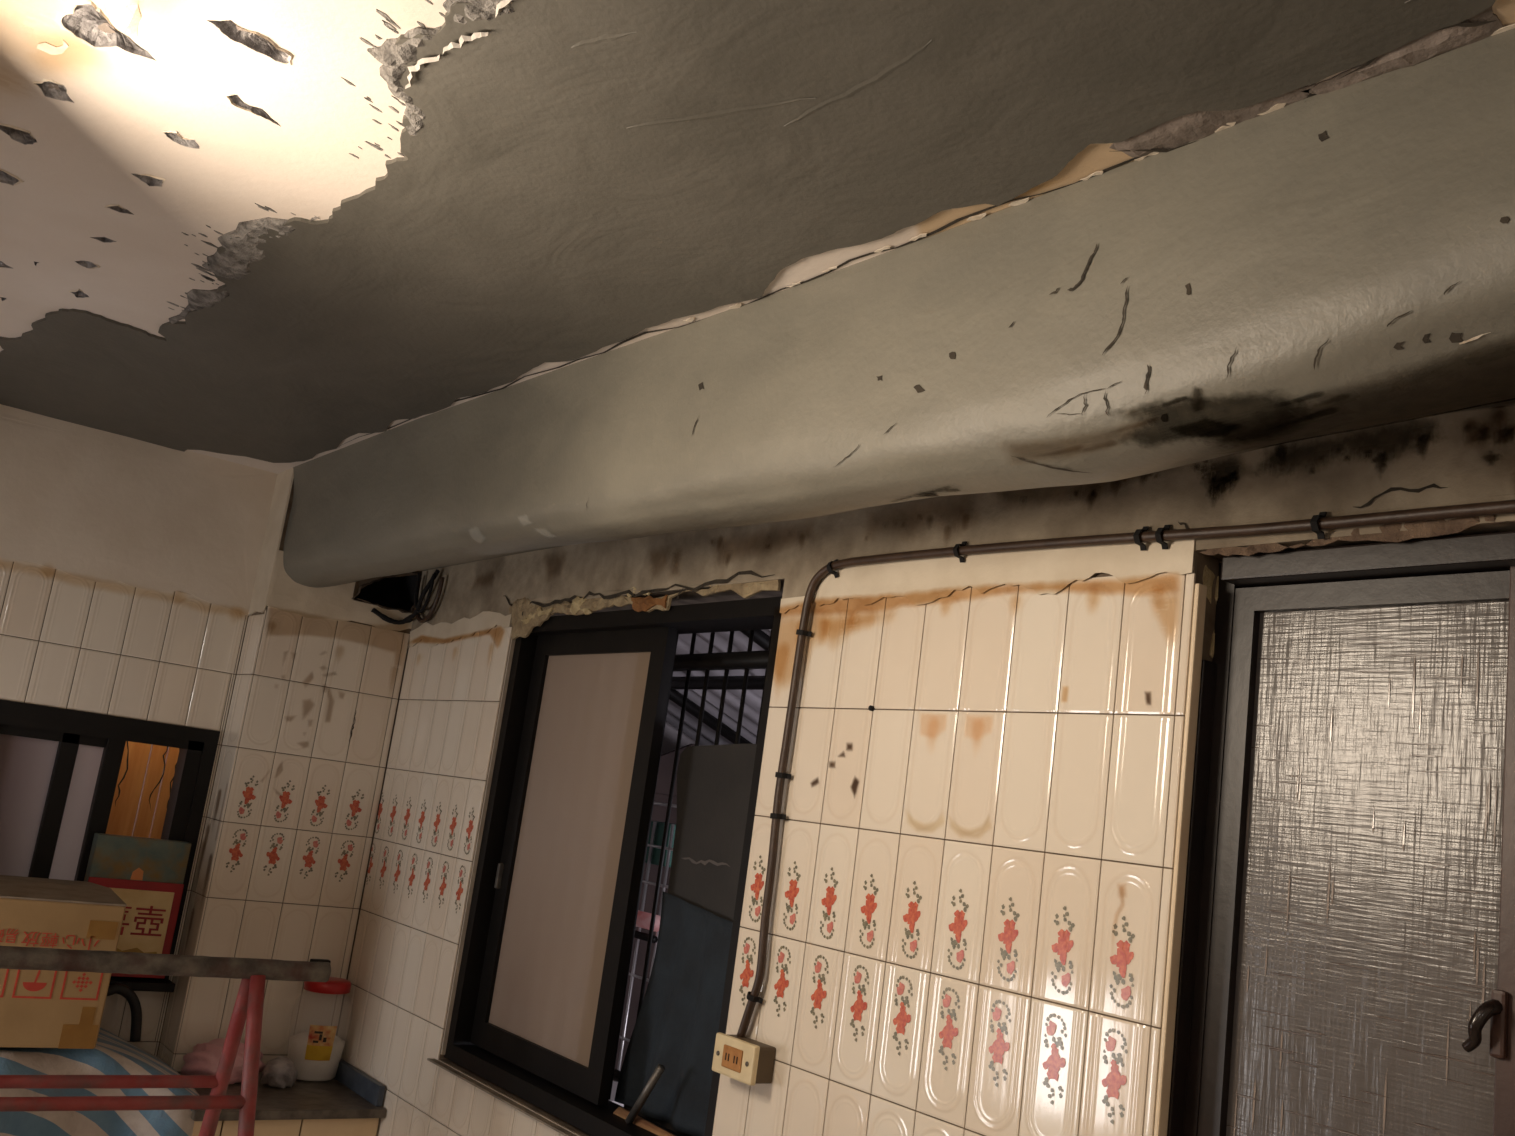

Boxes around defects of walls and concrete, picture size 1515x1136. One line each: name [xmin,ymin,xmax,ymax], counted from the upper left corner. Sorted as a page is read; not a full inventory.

spalling [37,0,156,61]
spalling [206,20,294,65]
peeling [405,0,512,89]
spalling [33,79,74,103]
spalling [225,94,279,125]
spalling [1109,6,1503,158]
spalling [163,130,200,149]
crack [1313,338,1329,370]
leakage [1131,388,1431,472]
crack [1013,456,1088,473]
leakage [1196,462,1244,500]
flaking render [509,580,781,640]